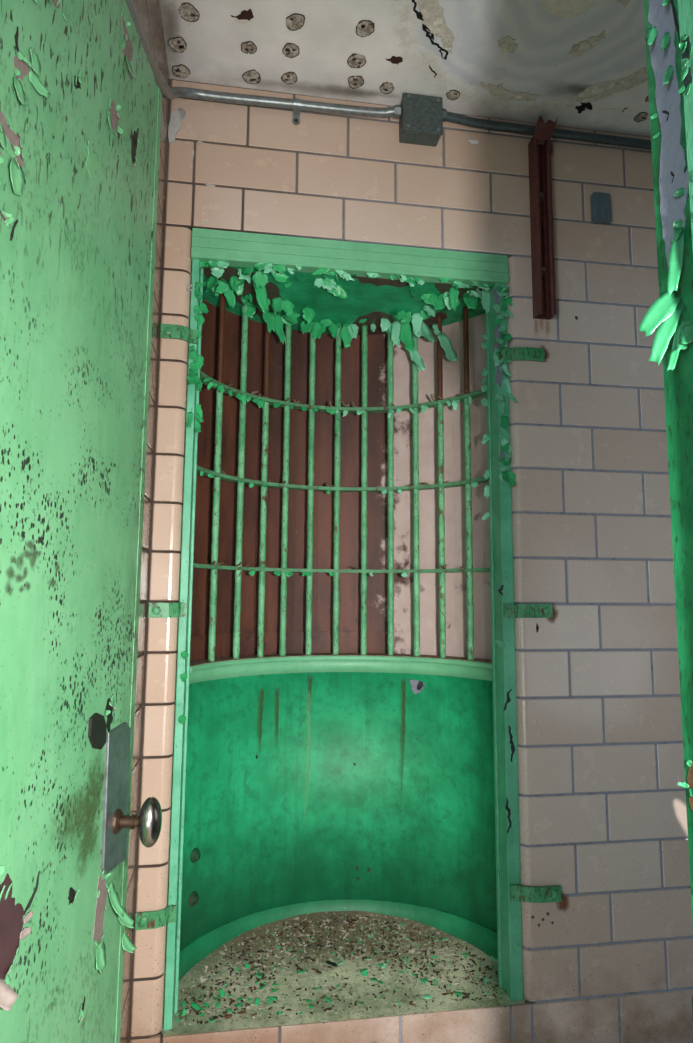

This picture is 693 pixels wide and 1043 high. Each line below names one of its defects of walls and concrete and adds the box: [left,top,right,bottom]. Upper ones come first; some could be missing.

peeling [13,26,51,106]
crack [412,0,448,78]
peeling [0,111,26,196]
peeling [568,0,693,371]
damp [7,542,39,593]
peeling [0,866,40,1011]